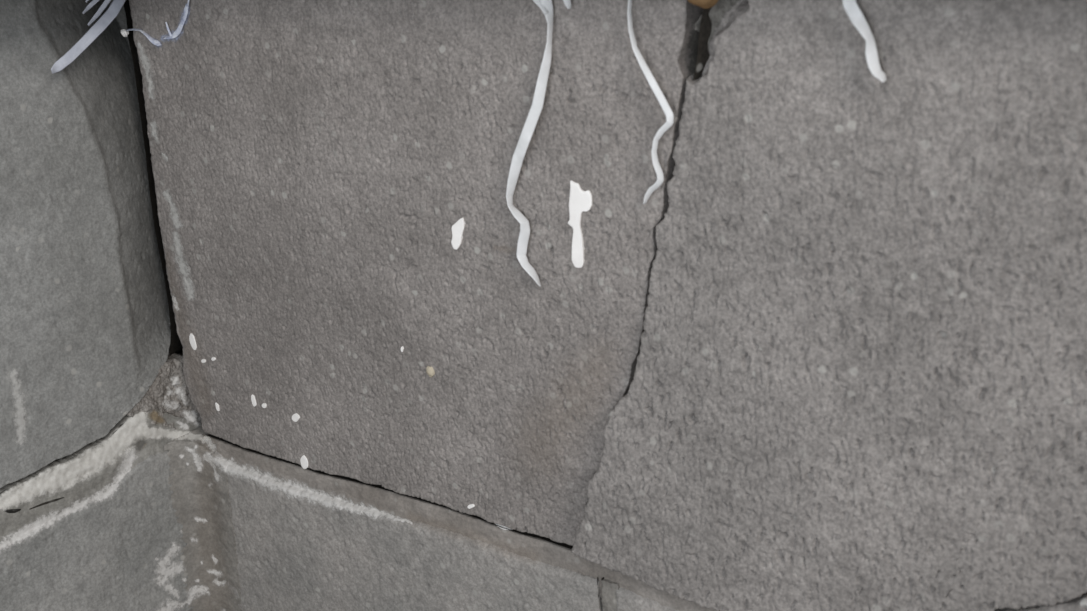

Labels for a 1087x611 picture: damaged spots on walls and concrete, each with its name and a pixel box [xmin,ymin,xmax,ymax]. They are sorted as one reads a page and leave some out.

crack [693,7,712,81]
spalling [686,0,740,76]
peeling [568,180,592,268]
efflorescence [10,369,26,444]
damp [0,448,138,550]
efflorescence [179,438,413,524]
crack [207,434,573,549]
efflorescence [154,542,226,611]